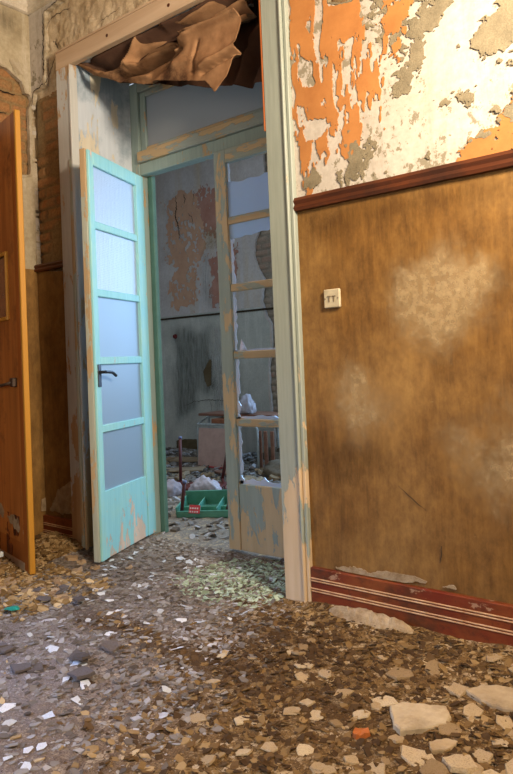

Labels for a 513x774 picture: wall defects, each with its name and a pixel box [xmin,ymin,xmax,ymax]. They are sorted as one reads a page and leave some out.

flaking render [0,0,150,265]
peeling [289,0,454,195]
peeling [439,85,478,108]
peeling [456,90,513,162]
peeling [457,0,513,65]
peeling [160,184,220,313]
flaking render [253,230,278,412]
peeling [336,566,427,584]